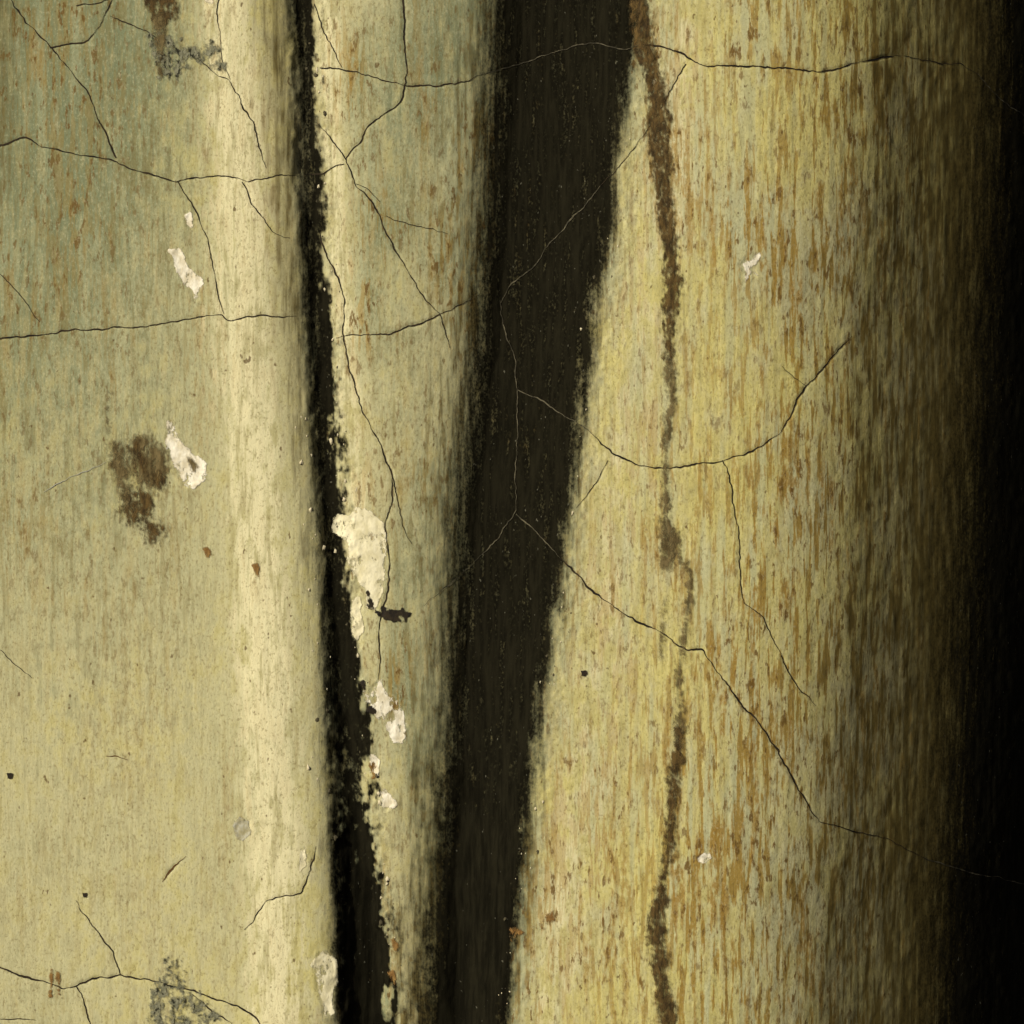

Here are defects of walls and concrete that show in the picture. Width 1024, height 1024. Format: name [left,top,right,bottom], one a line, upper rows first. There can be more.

water stain [144,0,226,81]
spalling [168,248,204,298]
crack [0,0,1024,676]
water stain [106,409,170,544]
spalling [165,421,207,489]
crack [424,126,1023,884]
peeling [312,497,411,658]
peeling [360,680,406,743]
crack [244,847,316,930]
crack [0,902,260,1024]
peeling [310,951,338,1015]